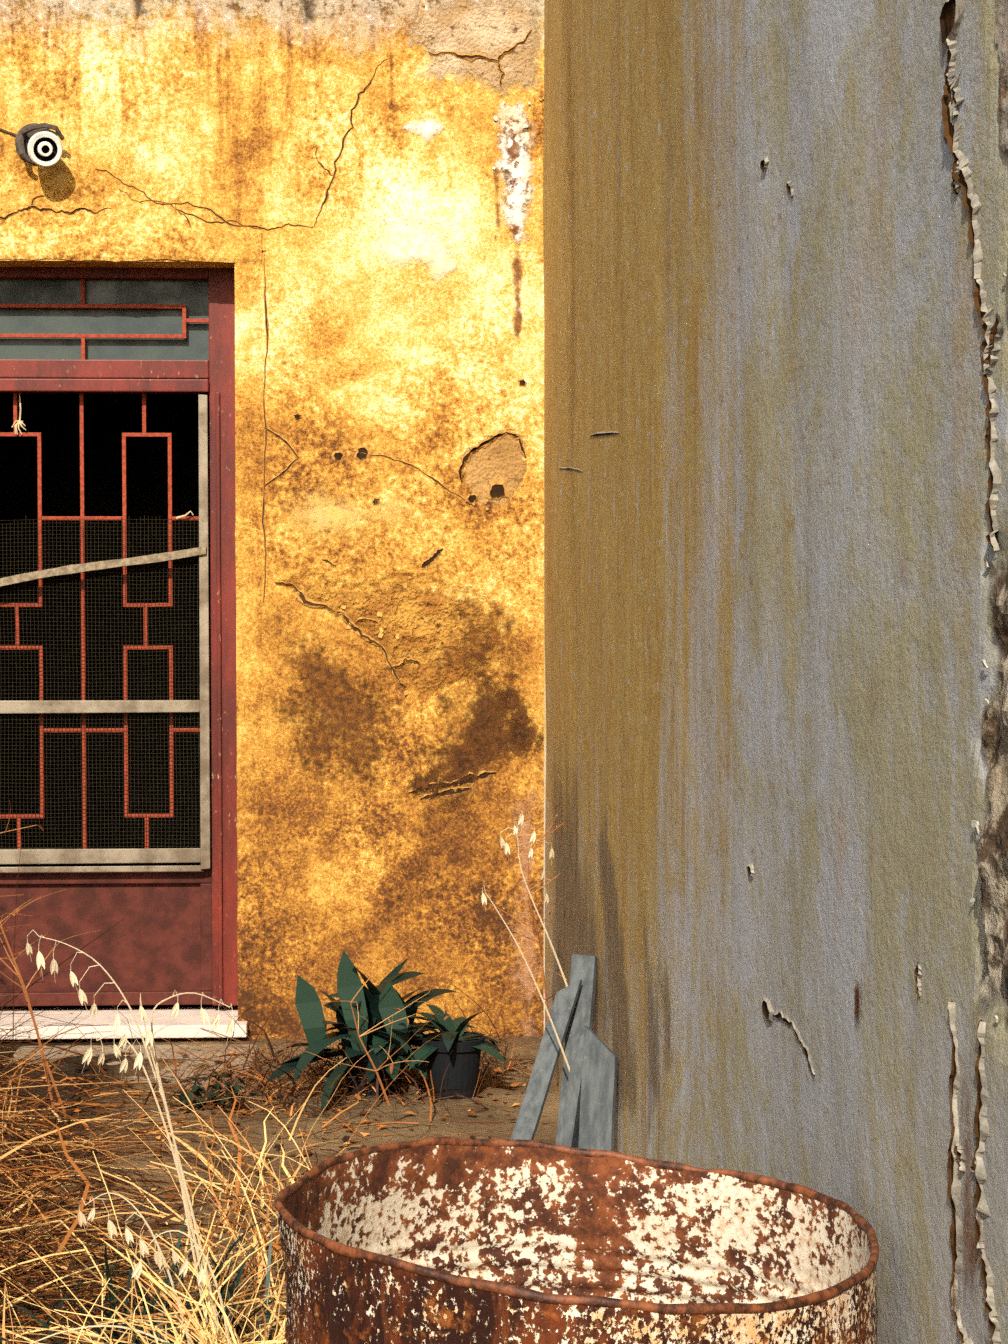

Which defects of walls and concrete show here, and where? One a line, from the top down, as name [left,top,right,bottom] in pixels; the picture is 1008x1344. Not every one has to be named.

damp [303,0,315,22]
flaking render [404,0,544,240]
crack [428,29,532,87]
flaking render [994,0,1008,153]
crack [0,58,389,602]
crack [456,431,526,481]
flaking render [970,557,1008,1022]